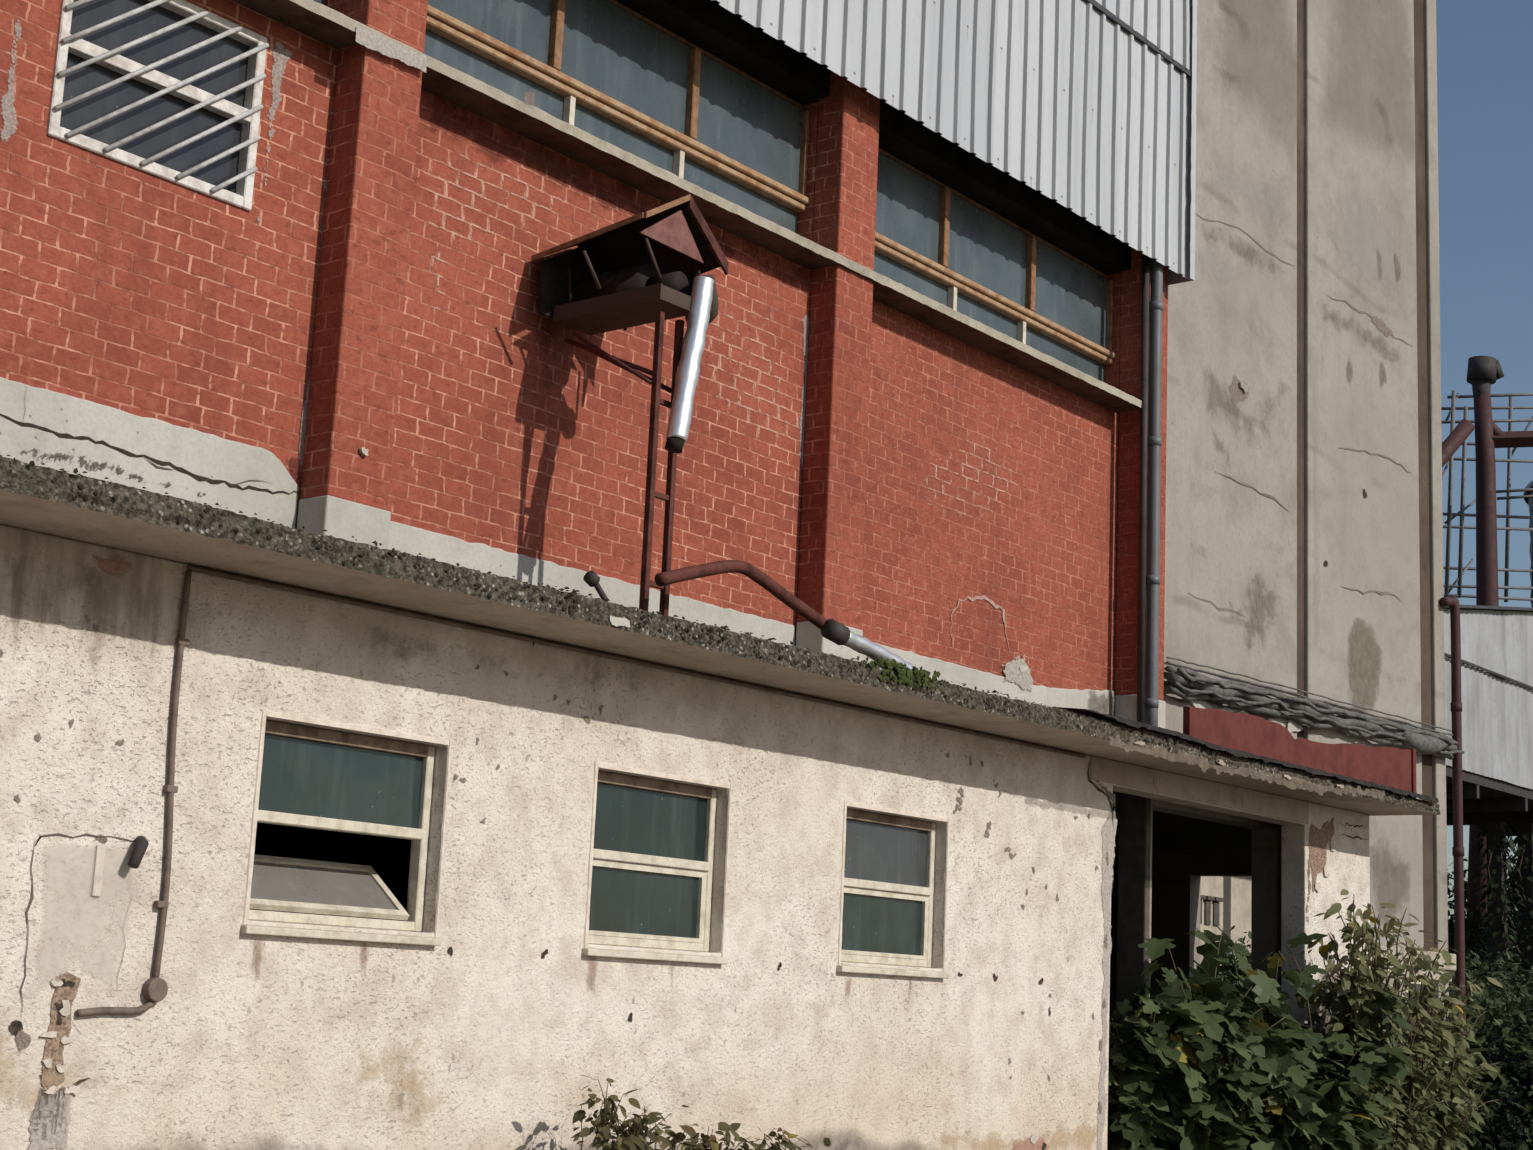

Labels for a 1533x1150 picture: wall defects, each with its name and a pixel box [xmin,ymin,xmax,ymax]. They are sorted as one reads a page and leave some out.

peeling [275,47,292,79]
peeling [1,87,18,140]
crack [1197,214,1295,266]
crack [1327,295,1413,351]
crack [0,388,300,494]
spalling [1002,654,1033,692]
leakage [1349,619,1380,712]
crack [20,833,135,1018]
spalling [15,972,90,1150]